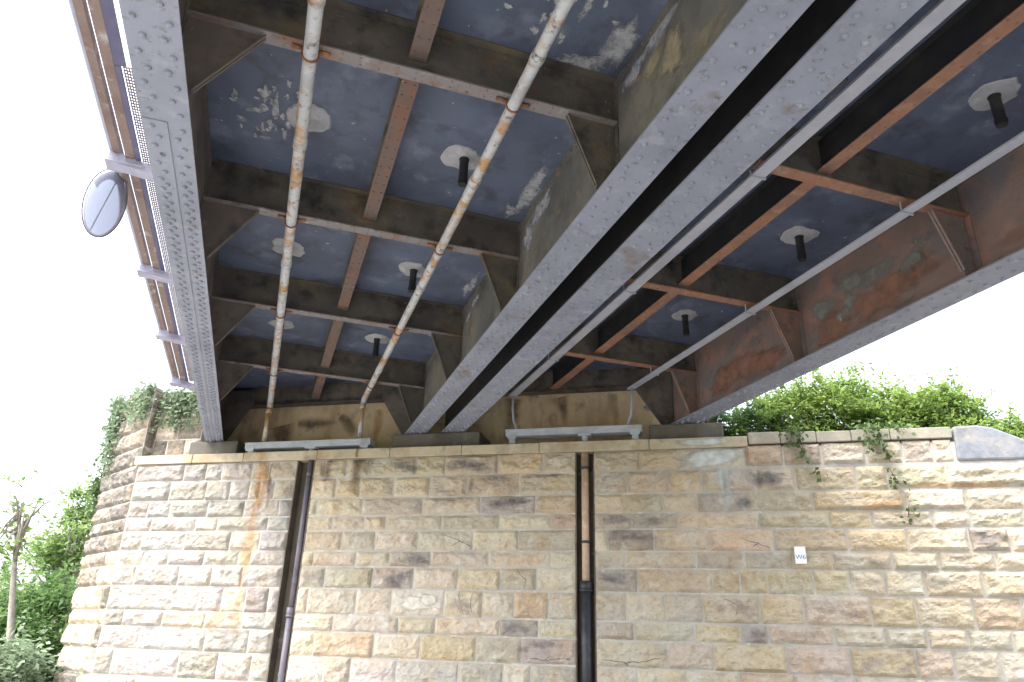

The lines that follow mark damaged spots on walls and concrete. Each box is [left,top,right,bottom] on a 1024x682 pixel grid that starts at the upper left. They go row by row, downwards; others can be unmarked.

peeling [572,0,609,19]
peeling [558,3,682,89]
peeling [237,80,299,139]
peeling [506,168,550,253]
peeling [463,276,479,322]